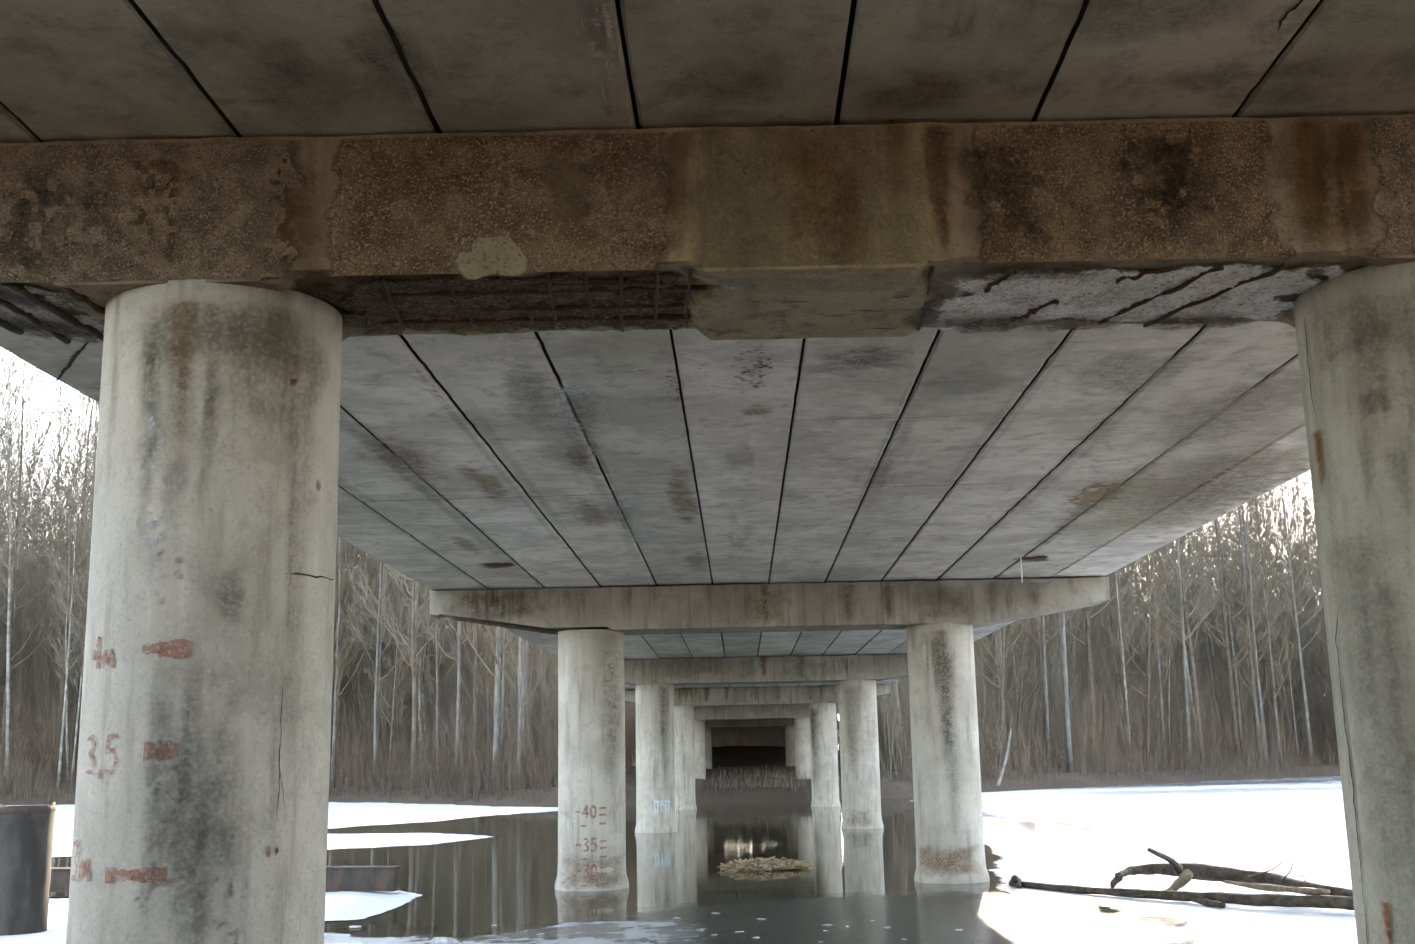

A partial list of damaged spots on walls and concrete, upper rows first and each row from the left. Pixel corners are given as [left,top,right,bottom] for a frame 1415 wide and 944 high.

crack [1277,0,1303,30]
peeling [0,140,307,345]
peeling [305,132,726,336]
crack [287,572,334,580]